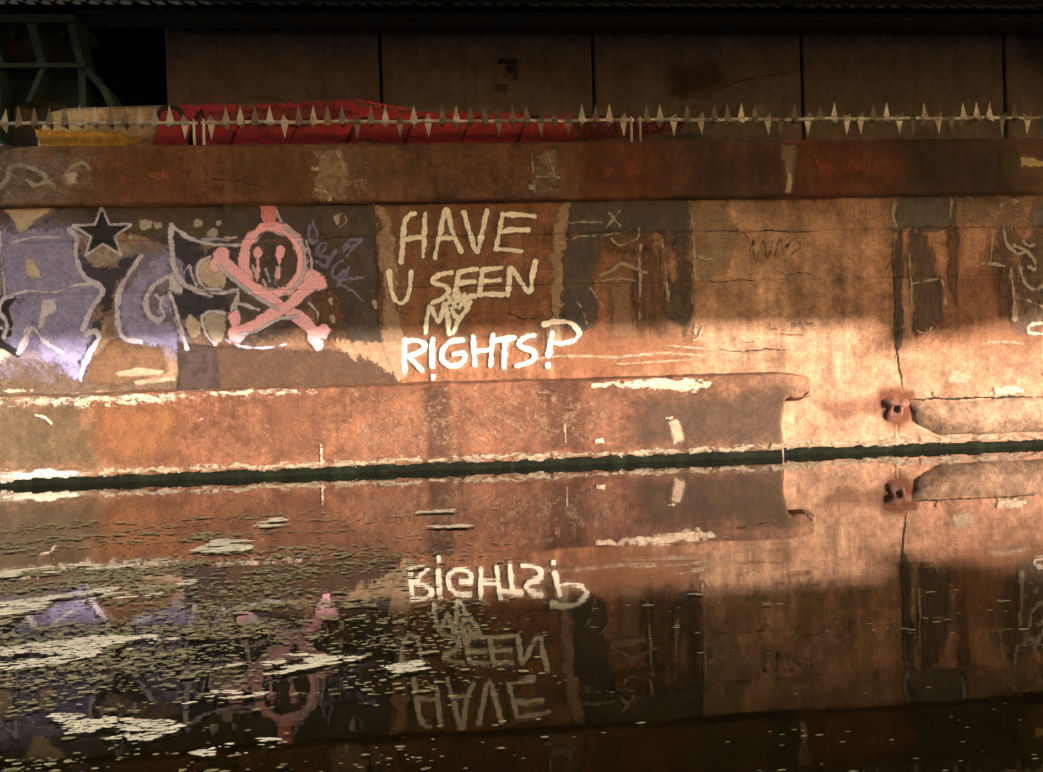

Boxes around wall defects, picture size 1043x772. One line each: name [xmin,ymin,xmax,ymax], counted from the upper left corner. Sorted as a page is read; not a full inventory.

crack [882,231,1043,401]
rust [96,403,176,463]